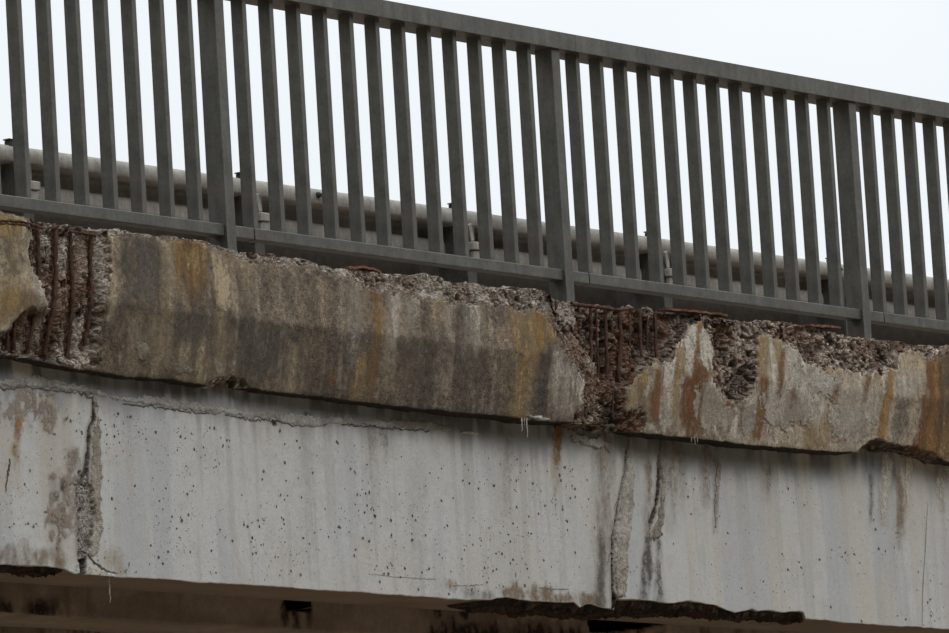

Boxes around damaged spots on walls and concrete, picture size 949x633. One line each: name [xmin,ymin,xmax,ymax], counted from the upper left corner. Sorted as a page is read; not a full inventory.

spalling [0,217,949,465]
rust [630,308,728,437]
leakage [644,325,724,430]
rust [752,335,795,439]
leakage [766,337,826,426]
rust [866,370,895,440]
crack [69,392,118,575]
peeling [0,374,451,566]
crack [608,437,629,602]
spalling [425,466,814,633]
leakage [641,537,662,599]
crack [648,440,661,547]